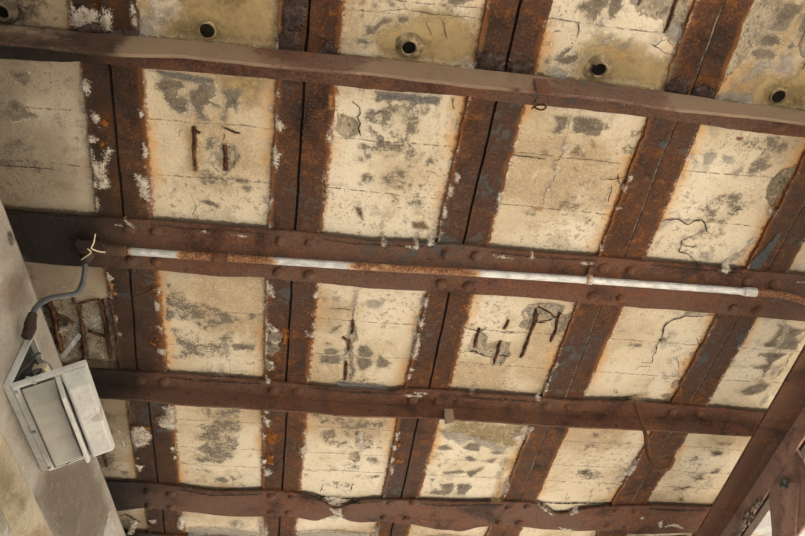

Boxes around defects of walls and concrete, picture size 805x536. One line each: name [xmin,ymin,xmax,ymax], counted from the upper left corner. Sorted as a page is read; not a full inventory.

water stain [66,0,113,34]
spalling [722,0,805,84]
water stain [718,55,805,105]
peeling [154,71,243,176]
crack [352,102,361,136]
water stain [133,173,155,201]
crack [654,219,748,274]
spalling [41,297,119,362]
spalling [468,327,510,367]
spalling [519,303,571,358]
crack [635,314,721,370]